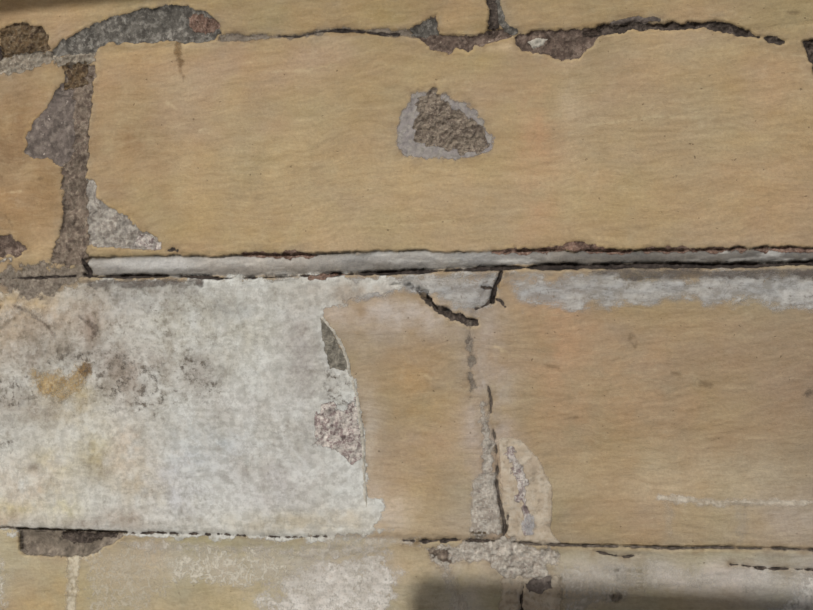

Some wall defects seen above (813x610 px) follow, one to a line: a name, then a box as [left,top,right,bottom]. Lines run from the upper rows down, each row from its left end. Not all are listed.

spalling [0,4,221,76]
crack [218,27,417,42]
crack [583,16,813,69]
spalling [397,88,495,160]
spalling [86,179,179,252]
spalling [242,249,317,260]
spalling [492,241,813,255]
water stain [0,268,499,610]
peeling [314,316,368,507]
crack [403,270,813,571]
crack [499,574,562,610]
water stain [742,573,813,610]